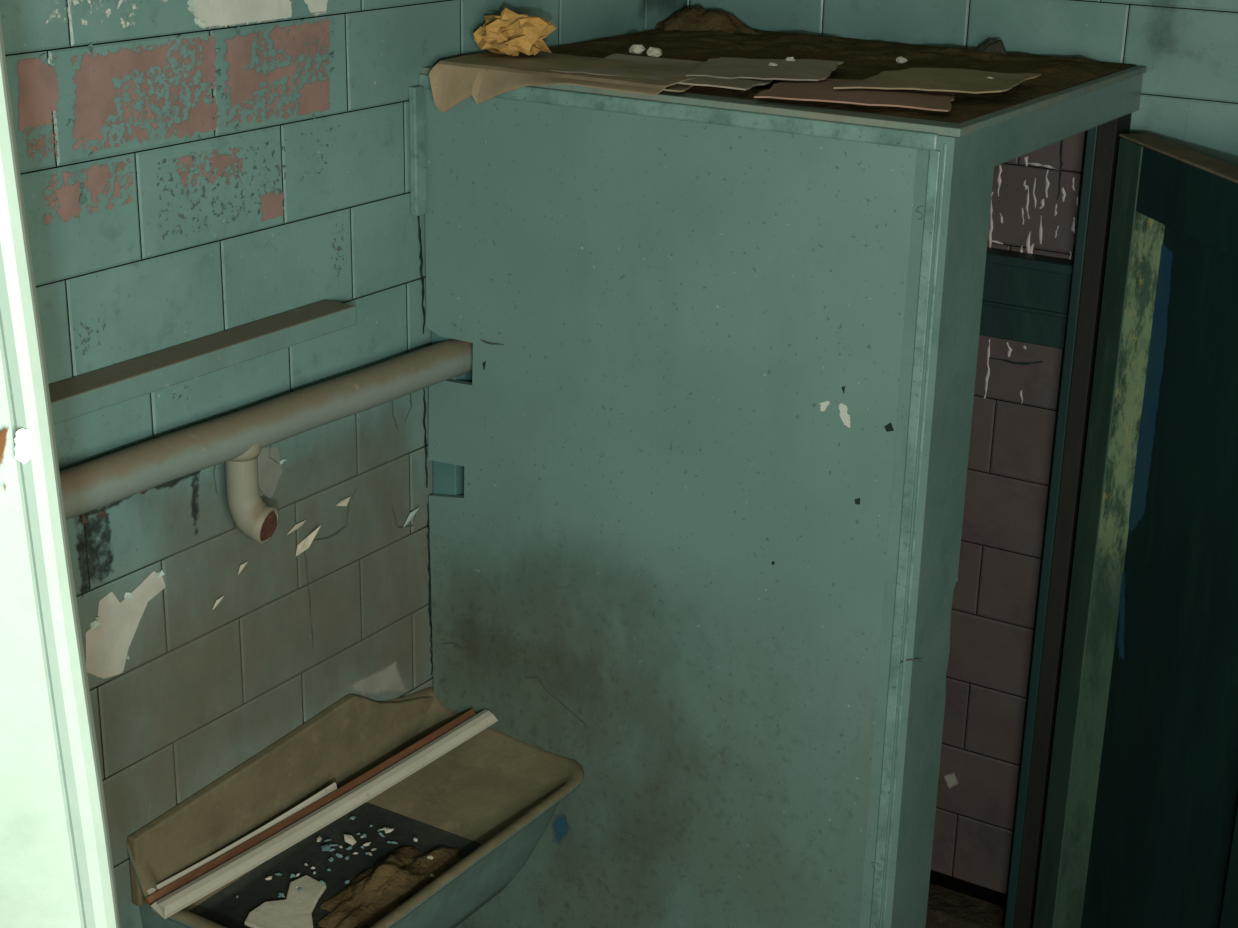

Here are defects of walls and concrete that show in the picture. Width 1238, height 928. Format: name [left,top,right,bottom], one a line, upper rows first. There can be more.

peeling [17,0,340,240]
peeling [14,428,33,464]
water stain [77,471,200,597]
peeling [287,520,321,556]
peeling [85,570,166,679]